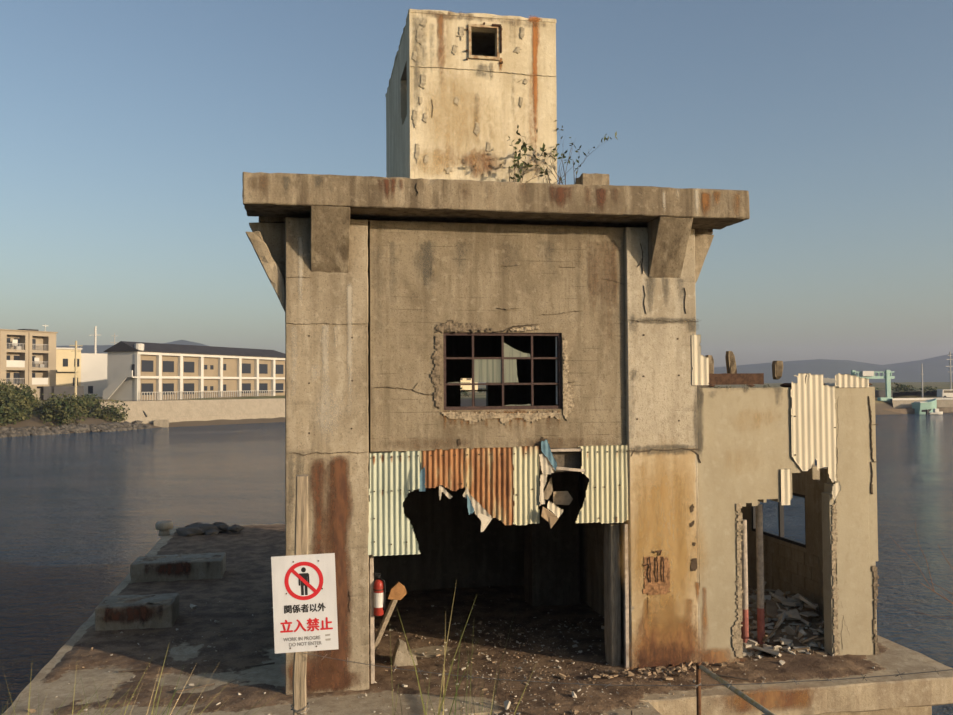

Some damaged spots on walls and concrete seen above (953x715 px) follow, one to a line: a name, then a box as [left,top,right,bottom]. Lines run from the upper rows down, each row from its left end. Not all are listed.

corrosion [529,16,539,123]
corrosion [464,154,494,175]
corrosion [702,192,719,212]
crack [571,243,698,322]
spalling [430,320,574,425]
corrosion [102,605,162,623]
corrosion [306,457,357,693]
peeling [358,503,744,715]
corrosion [631,474,729,670]
spalling [823,501,843,669]